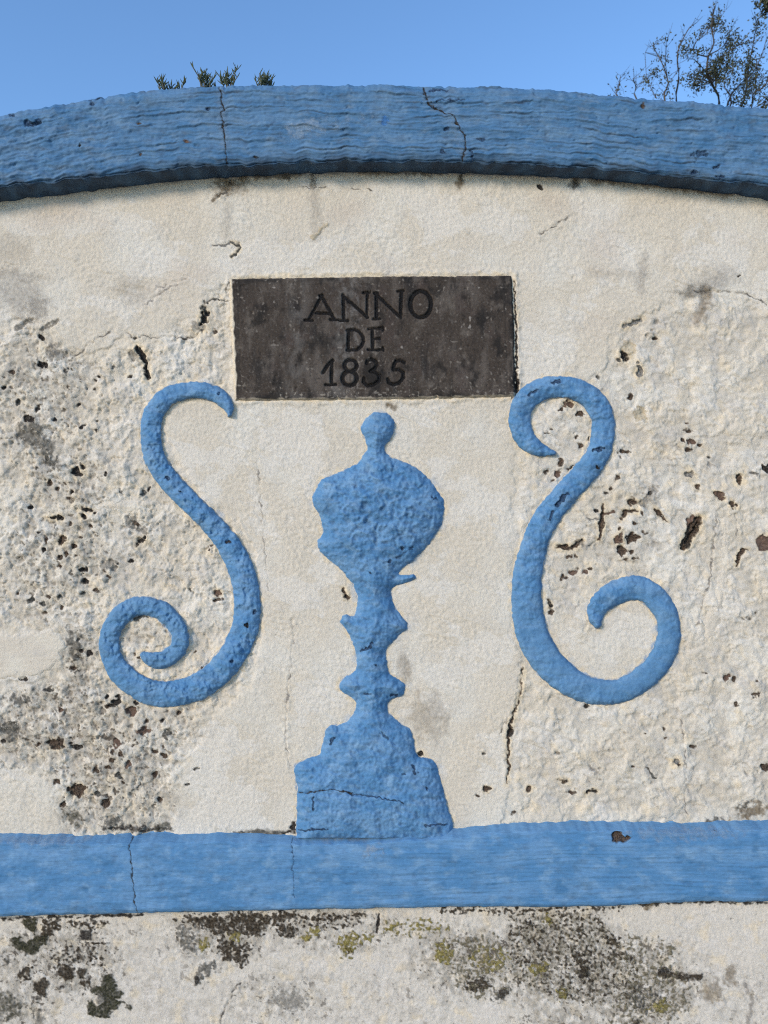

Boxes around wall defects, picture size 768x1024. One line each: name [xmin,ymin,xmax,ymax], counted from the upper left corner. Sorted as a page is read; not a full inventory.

crack [218,88,231,196]
crack [423,88,474,161]
spalling [128,337,151,380]
water stain [17,421,62,469]
spalling [614,490,657,561]
spalling [680,515,702,550]
spalling [557,539,592,581]
mould [0,721,20,742]
crack [500,667,524,783]
mould [101,817,171,833]
crack [291,789,404,897]
water stain [1,913,144,921]